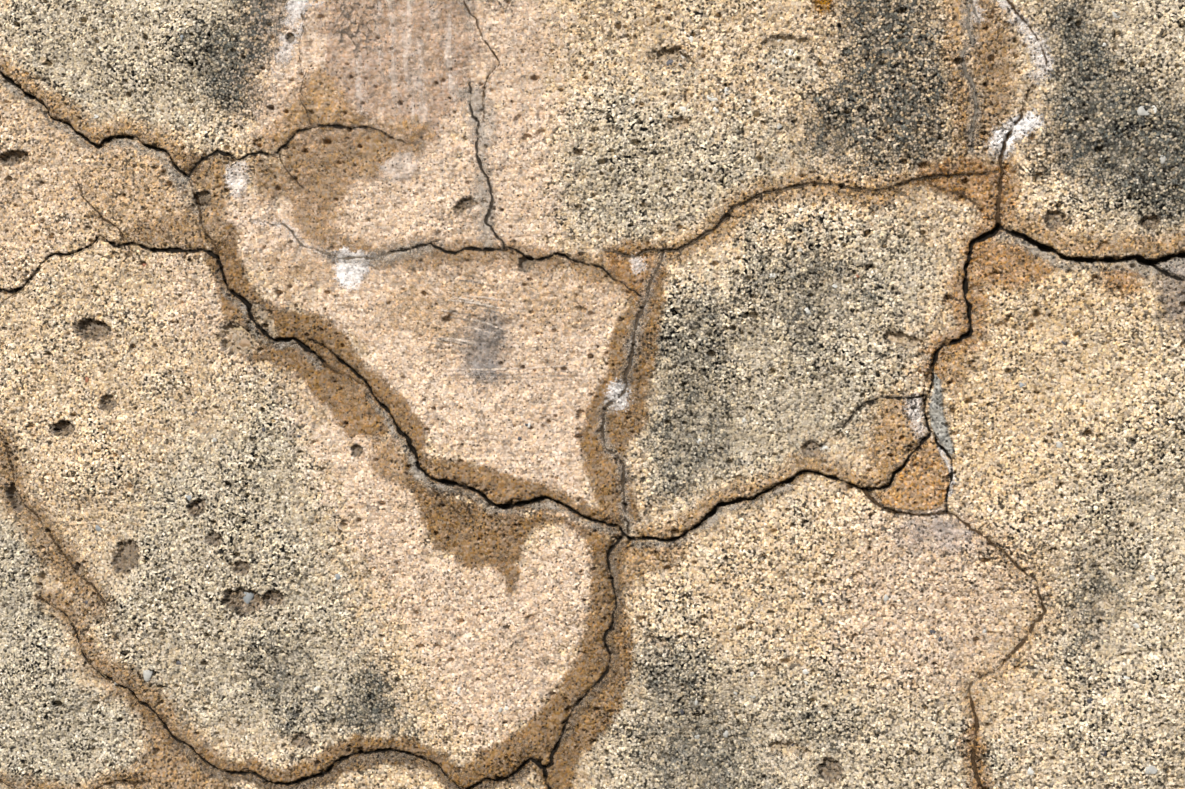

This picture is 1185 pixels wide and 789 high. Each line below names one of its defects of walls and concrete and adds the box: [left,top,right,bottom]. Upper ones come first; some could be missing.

crack [0,49,406,221]
crack [280,0,641,297]
damp [786,0,973,180]
crack [1006,0,1047,80]
damp [989,0,1185,232]
damp [197,224,778,789]
crack [0,96,1185,670]
damp [734,226,882,352]
peeling [881,375,953,510]
crack [2,586,461,789]
crack [468,536,623,789]
crack [969,681,989,789]